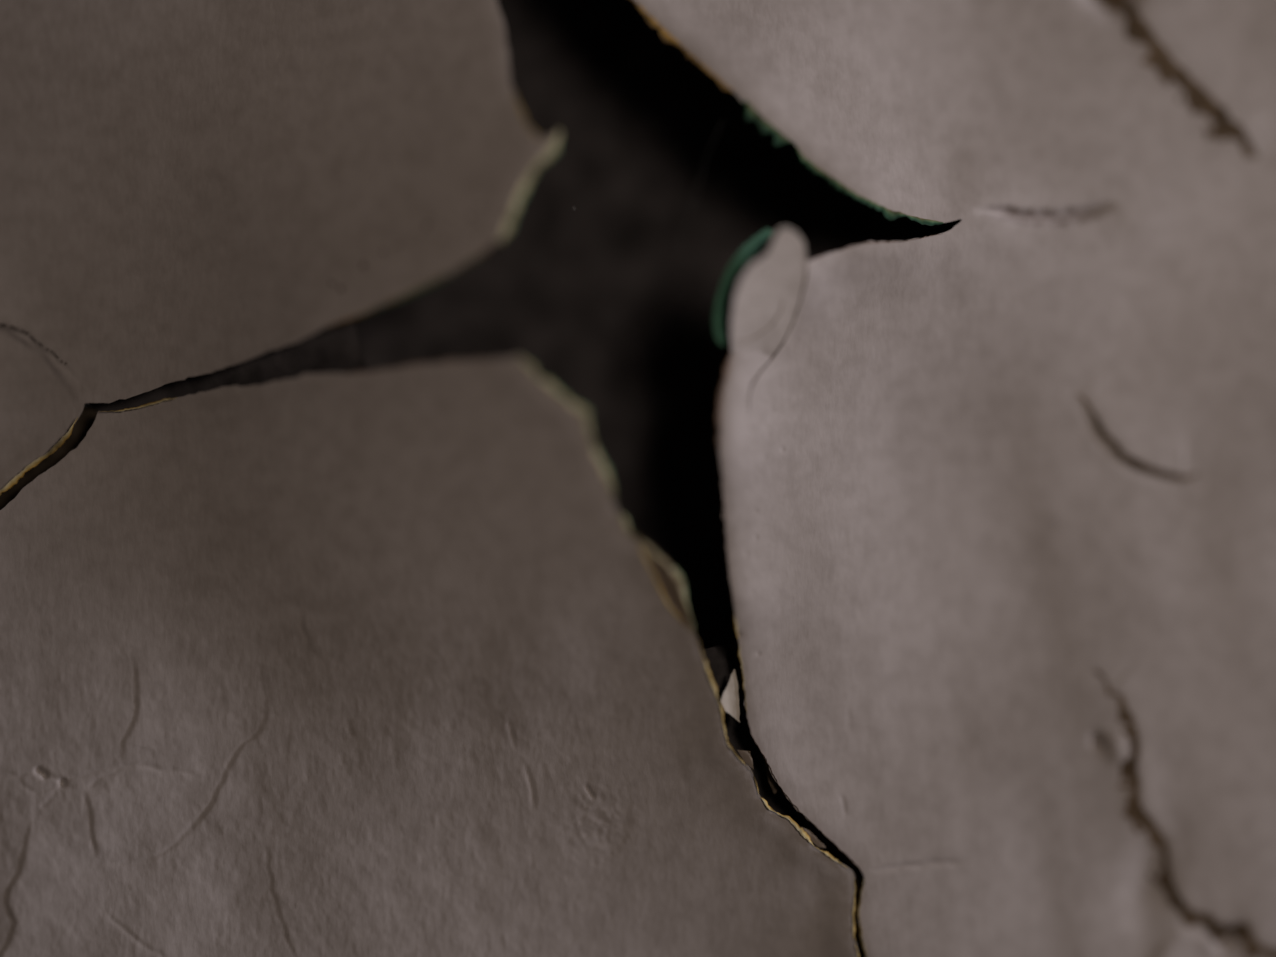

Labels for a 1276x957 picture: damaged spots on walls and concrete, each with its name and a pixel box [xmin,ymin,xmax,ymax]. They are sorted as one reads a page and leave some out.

crack [0,310,366,537]
peeling [93,0,962,957]
peeling [632,0,1165,861]
crack [1041,353,1241,509]